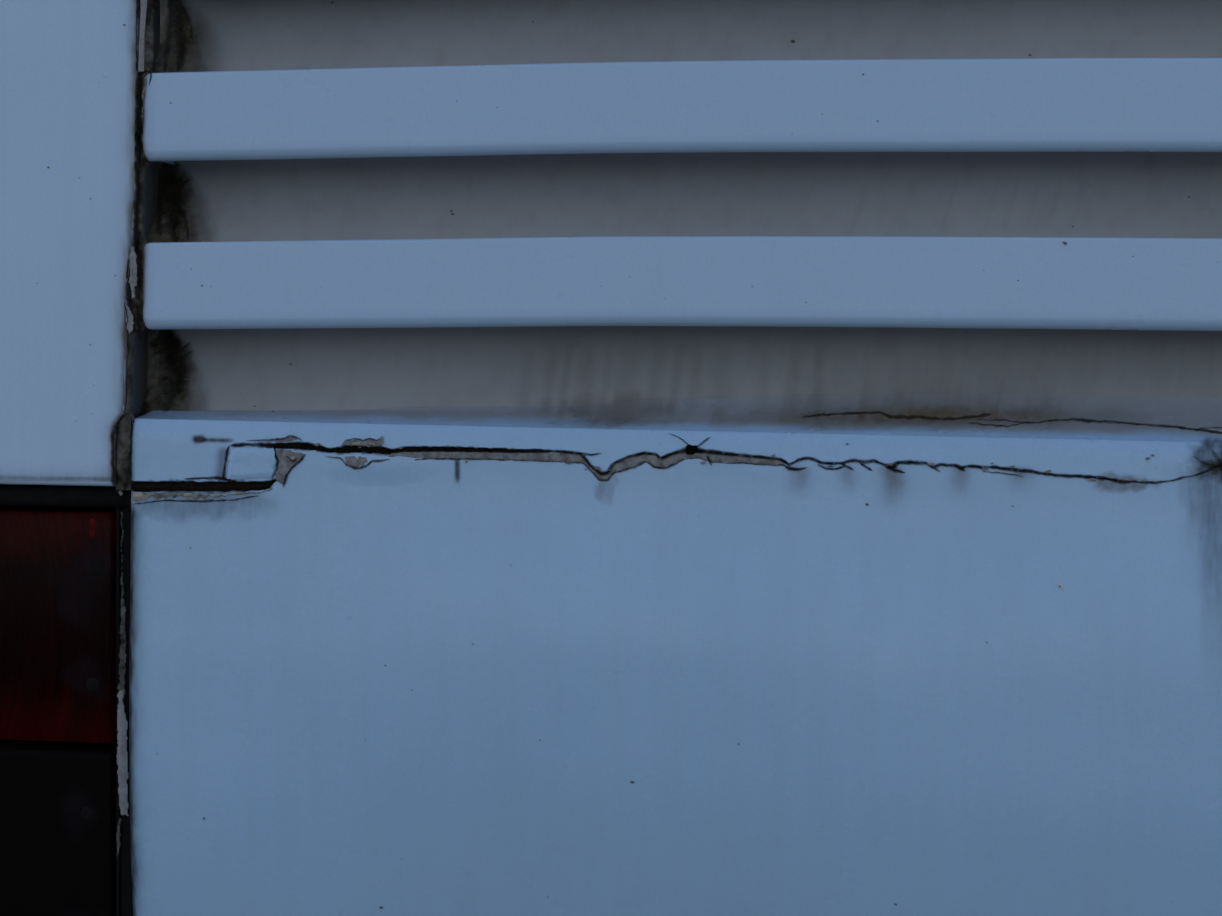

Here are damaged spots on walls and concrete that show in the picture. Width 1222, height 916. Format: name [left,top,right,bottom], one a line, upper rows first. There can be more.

spalling [227,435,306,486]
peeling [325,436,390,469]
crack [111,411,1222,504]
peeling [116,512,128,860]